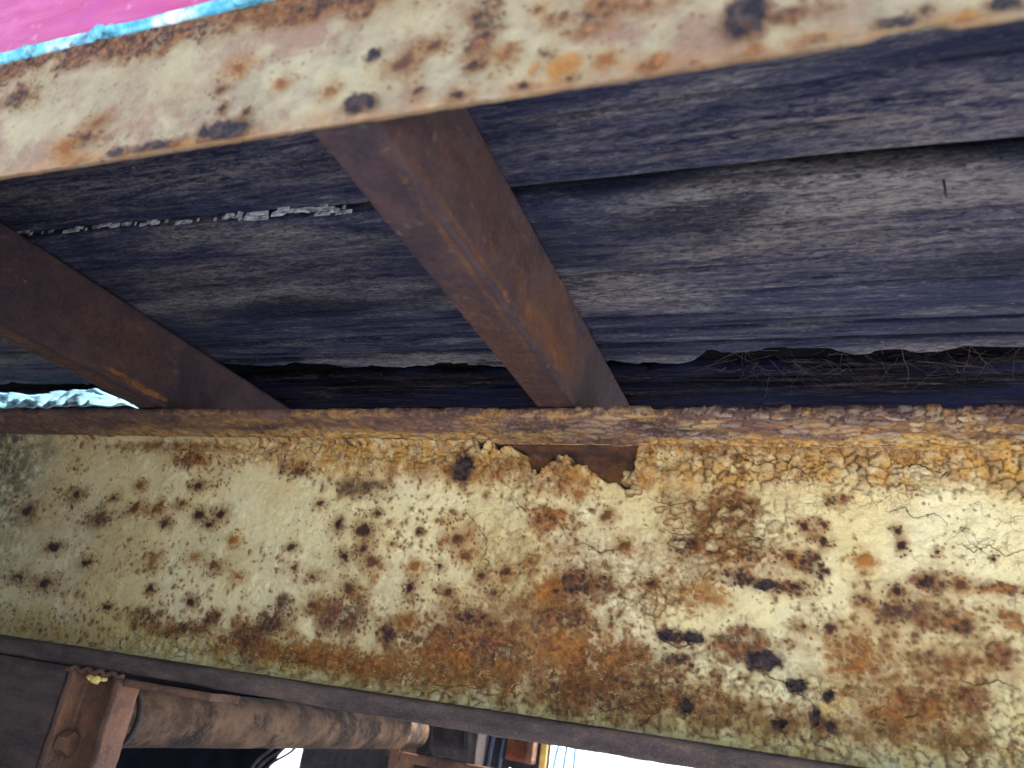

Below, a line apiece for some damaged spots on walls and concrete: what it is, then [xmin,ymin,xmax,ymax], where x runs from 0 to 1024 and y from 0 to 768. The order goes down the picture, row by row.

rust [523,0,655,37]
rust [768,0,835,26]
rust [0,0,378,115]
rust [379,0,522,103]
rust [509,49,623,90]
rust [78,437,247,548]
peeling [448,440,638,490]
crack [733,455,824,473]
crack [863,461,969,476]
crack [649,498,764,542]
crack [889,507,1024,557]
rust [96,461,1024,757]